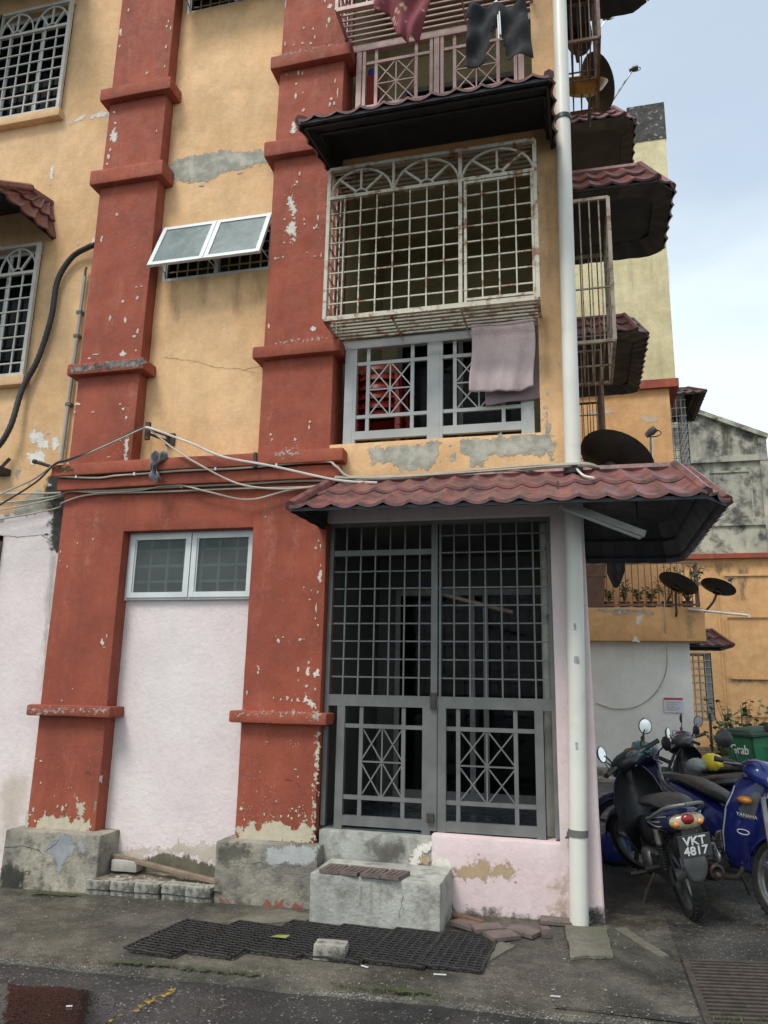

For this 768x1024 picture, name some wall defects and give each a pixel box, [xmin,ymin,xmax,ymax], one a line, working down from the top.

peeling [169,148,267,186]
peeling [283,172,319,244]
peeling [366,391,556,471]
damp [721,423,752,471]
peeling [0,426,60,522]
peeling [25,786,97,831]
peeling [234,732,321,843]
damp [139,844,250,877]
peeling [409,841,519,884]